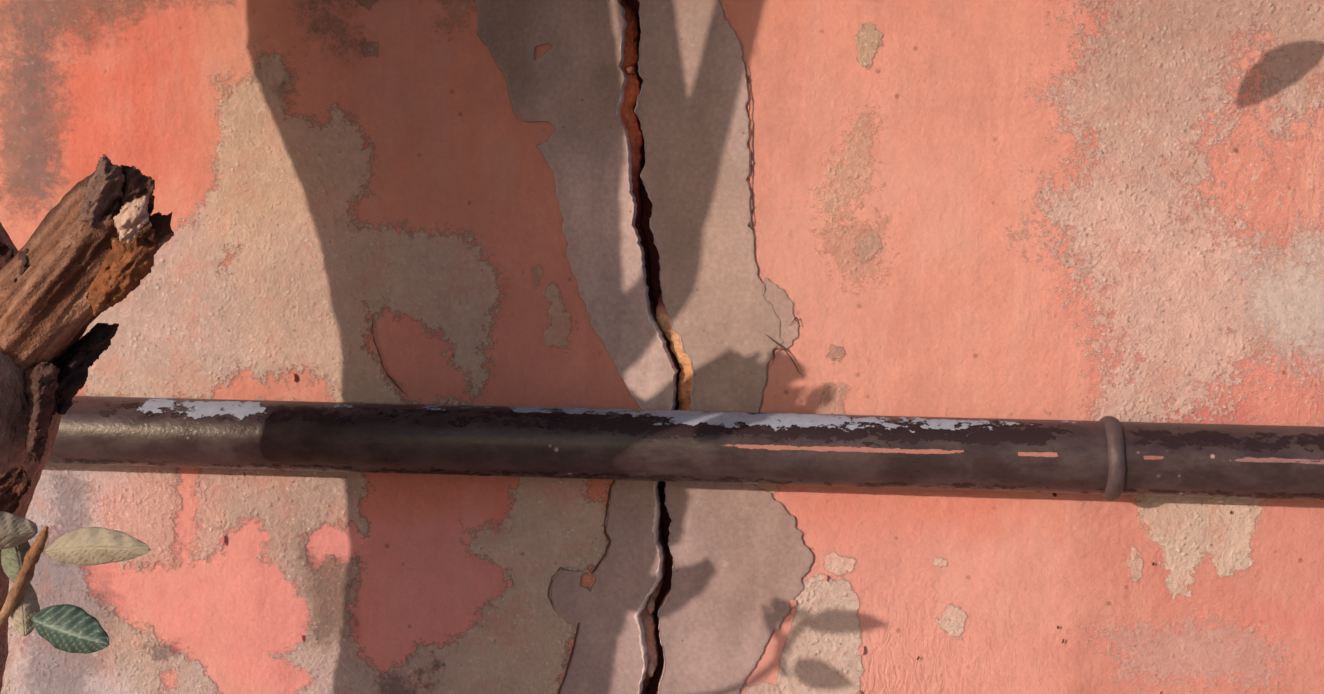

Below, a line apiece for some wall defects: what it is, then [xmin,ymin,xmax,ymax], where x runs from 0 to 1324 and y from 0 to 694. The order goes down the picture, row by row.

peeling [78,50,507,420]
crack [616,0,694,411]
water stain [1236,238,1324,372]
peeling [1,463,609,694]
crack [548,480,615,694]
crack [634,481,674,694]
peeling [746,552,864,694]
peeling [1127,495,1267,599]